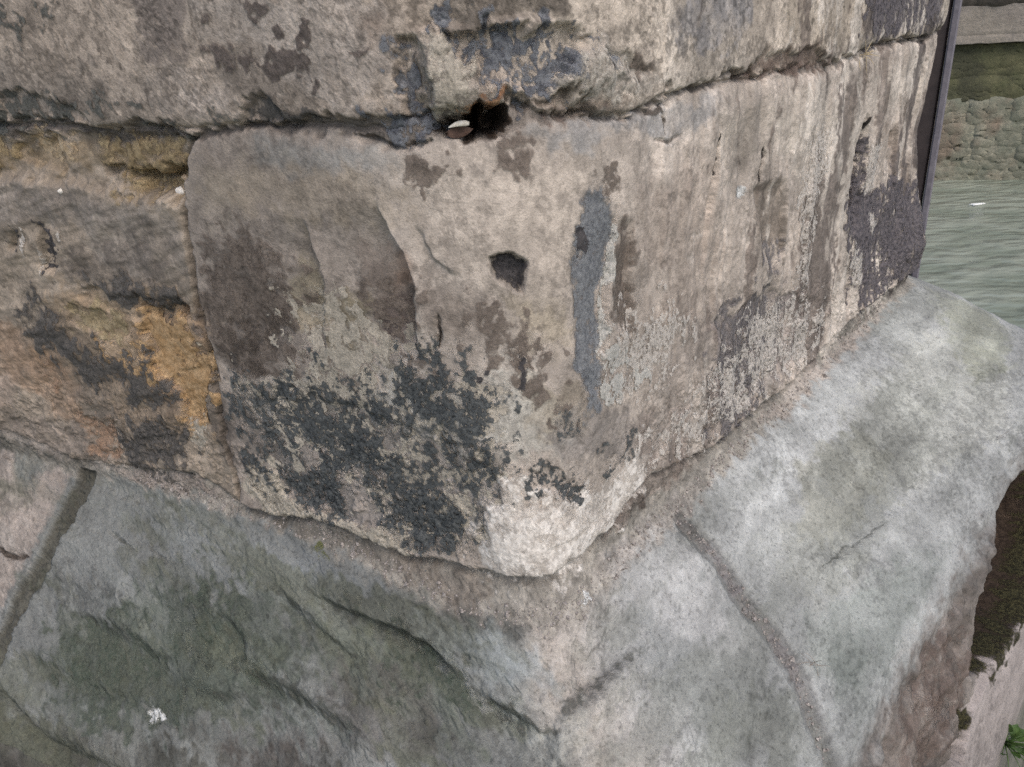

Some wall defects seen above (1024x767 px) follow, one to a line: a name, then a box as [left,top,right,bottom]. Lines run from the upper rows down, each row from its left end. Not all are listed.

peeling [13,162,927,590]
water stain [455,161,641,430]
water stain [792,124,835,302]
water stain [848,132,905,286]